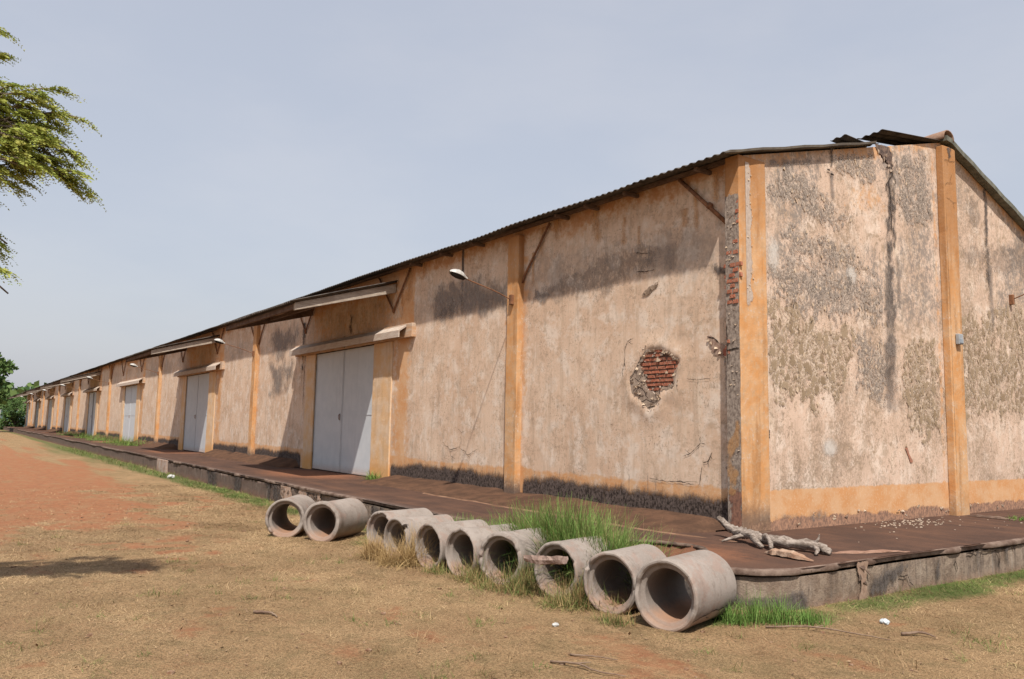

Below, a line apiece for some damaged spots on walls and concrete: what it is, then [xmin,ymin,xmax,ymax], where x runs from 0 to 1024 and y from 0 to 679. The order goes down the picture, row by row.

peeling [833,144,933,226]
spalling [629,345,679,412]
spalling [707,162,754,527]
peeling [766,167,890,416]
water stain [885,167,901,406]
peeling [962,303,1024,423]
mould [390,463,504,490]
water stain [523,471,728,530]